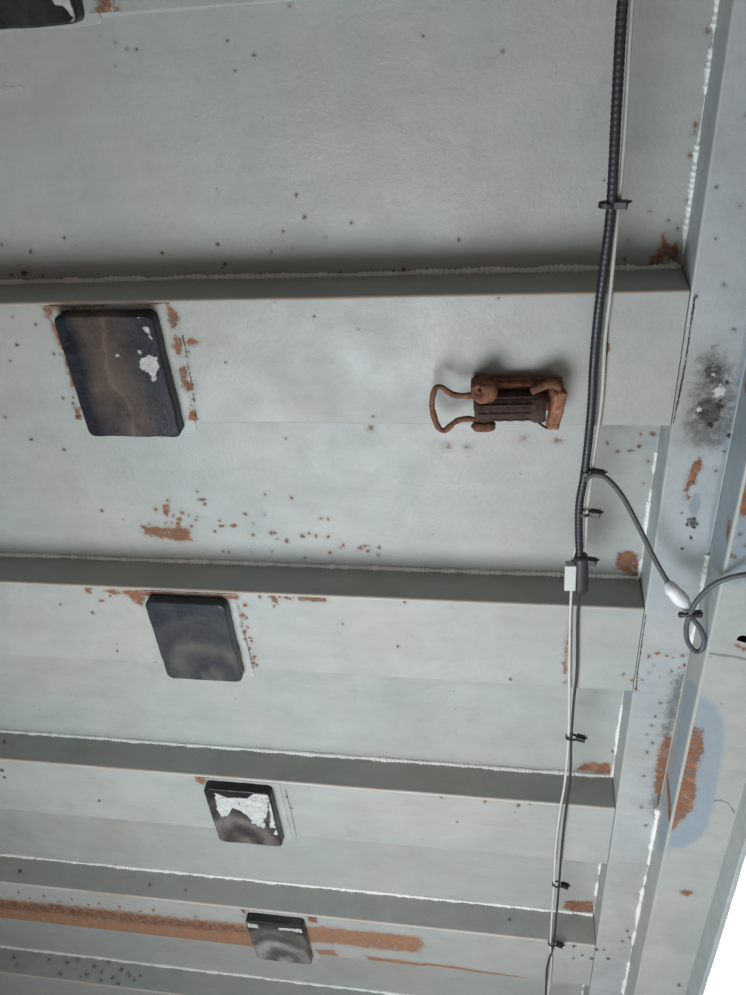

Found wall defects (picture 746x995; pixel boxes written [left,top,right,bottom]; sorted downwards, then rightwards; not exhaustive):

rust [82,0,135,14]
rust [619,206,683,266]
rust [35,303,202,421]
rust [679,454,716,502]
rust [119,489,209,546]
rust [210,511,384,559]
rust [609,544,642,576]
rust [81,587,330,669]
rust [572,748,614,775]
rust [643,716,715,835]
rust [0,890,254,947]
rust [559,897,595,913]